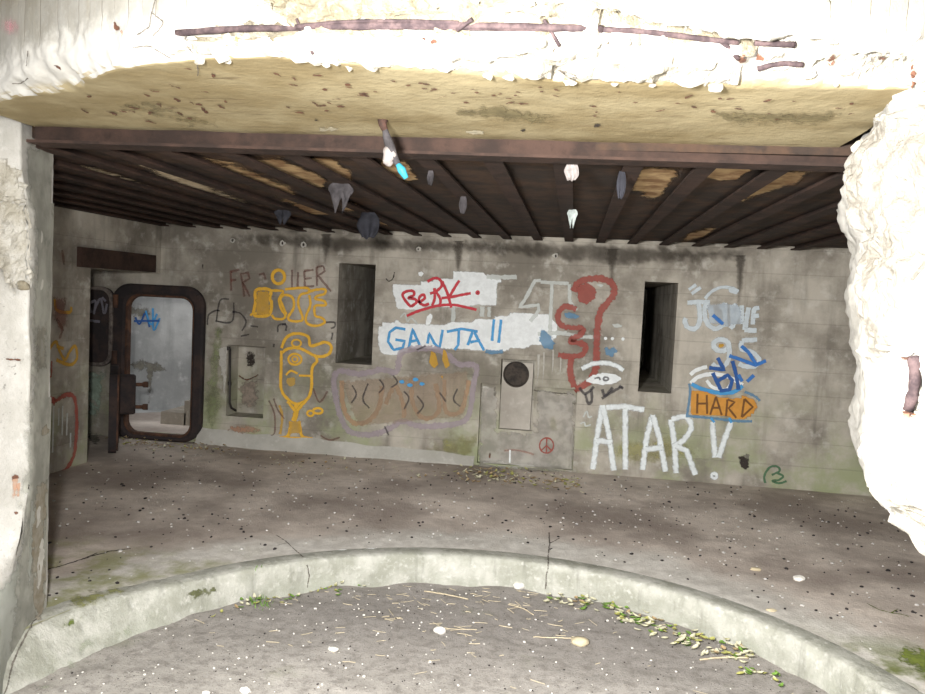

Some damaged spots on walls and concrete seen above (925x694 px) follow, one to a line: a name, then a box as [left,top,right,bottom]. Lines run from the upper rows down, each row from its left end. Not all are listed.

spalling [171,0,924,92]
peeling [742,171,806,201]
peeling [685,228,713,242]
spalling [845,102,925,361]
spalling [892,355,922,419]